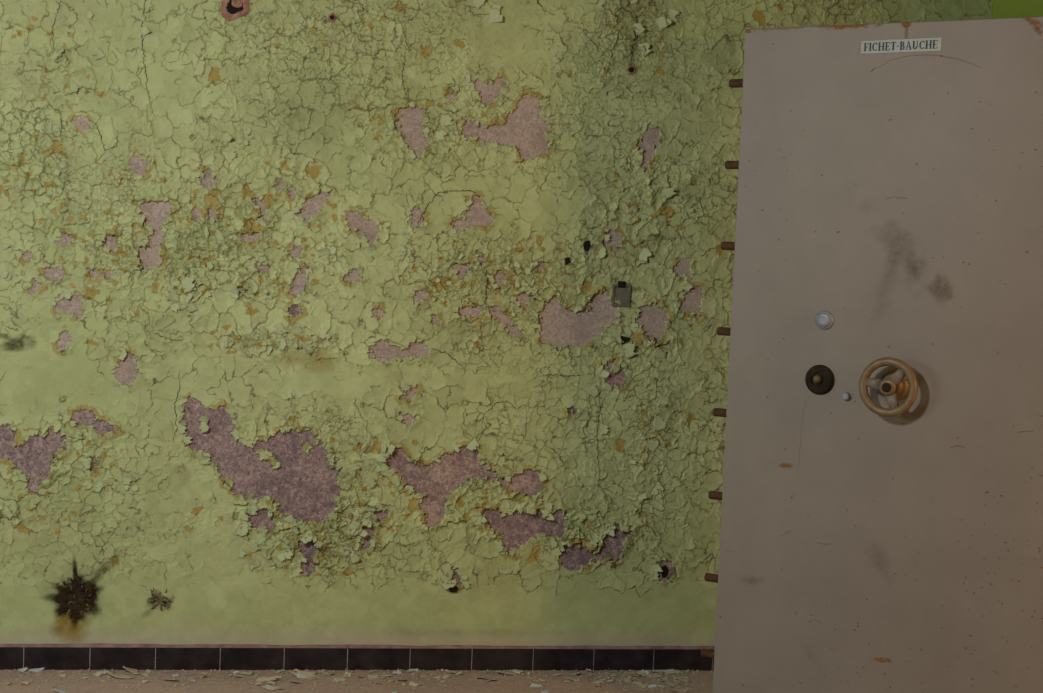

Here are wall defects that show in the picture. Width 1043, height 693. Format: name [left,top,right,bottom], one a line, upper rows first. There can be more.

crack [138,0,154,110]
crack [358,0,407,94]
peeling [394,74,556,160]
peeling [134,201,176,277]
crack [418,190,487,226]
peeling [412,246,619,350]
peeling [600,254,704,391]
peeling [0,409,116,504]
peeling [176,396,389,577]
peeling [349,436,634,576]
crack [479,400,529,445]
crack [586,394,613,493]